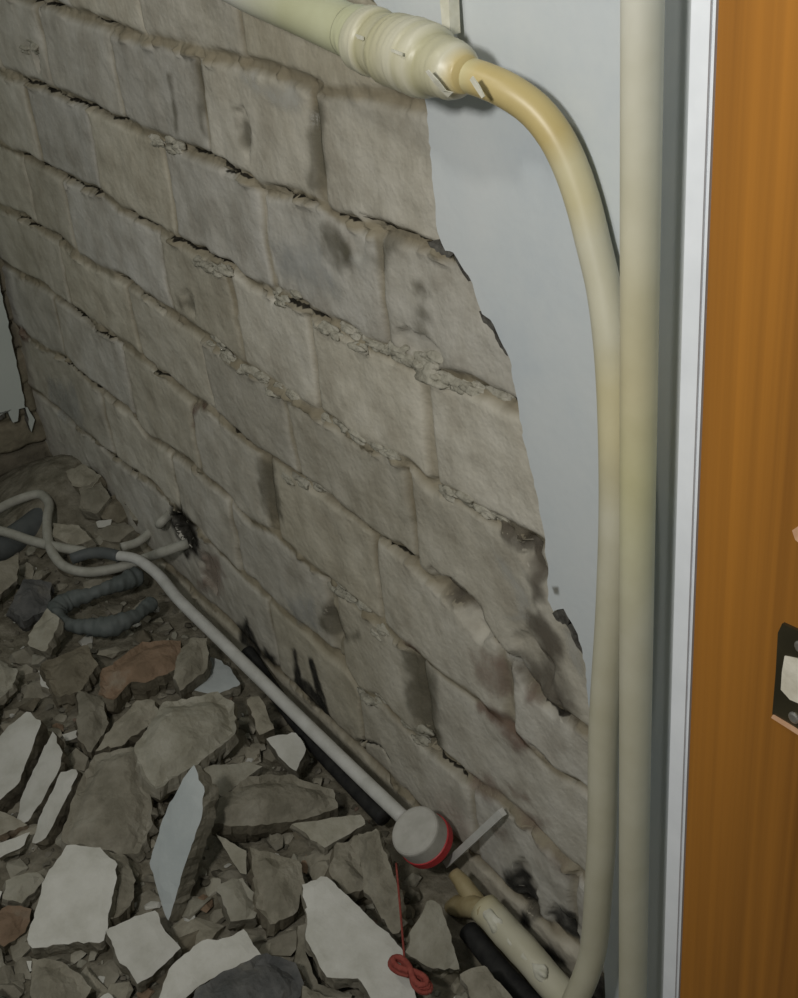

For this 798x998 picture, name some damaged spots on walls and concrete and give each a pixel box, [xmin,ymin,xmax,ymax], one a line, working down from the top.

flaking render [0,0,589,976]